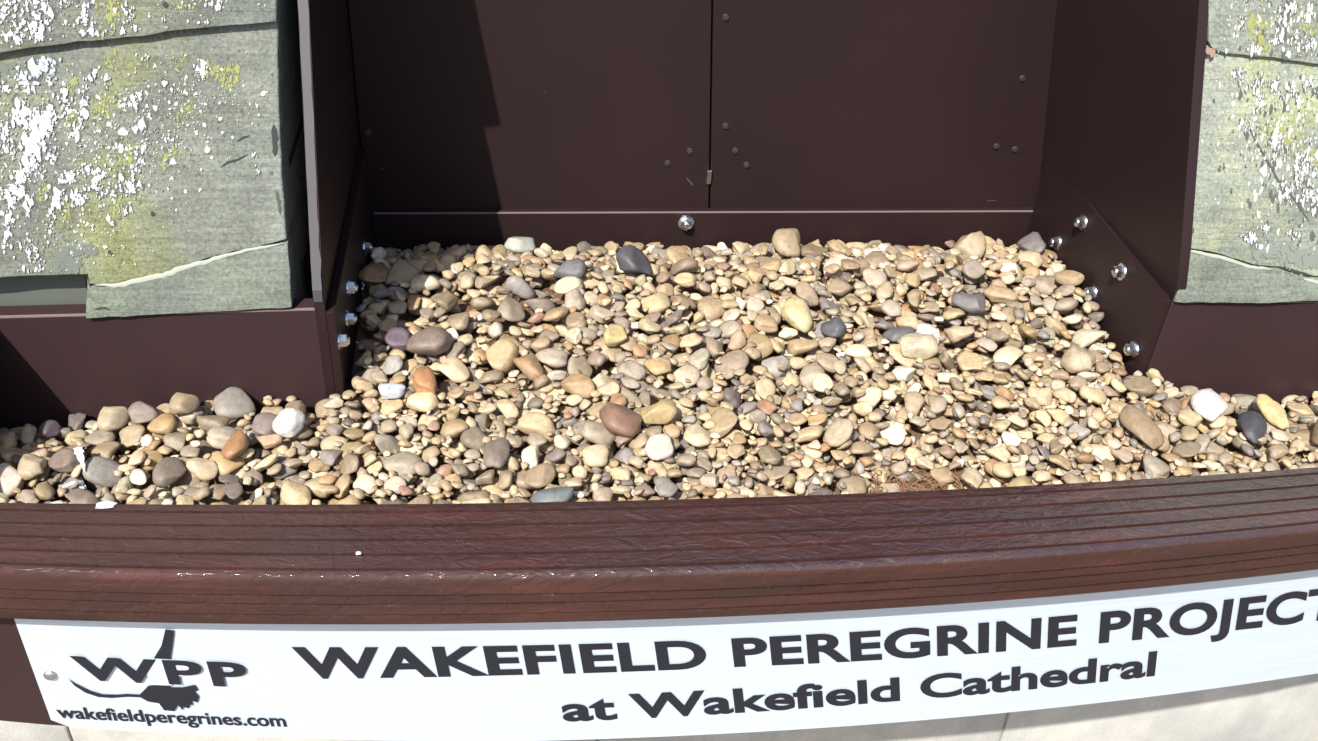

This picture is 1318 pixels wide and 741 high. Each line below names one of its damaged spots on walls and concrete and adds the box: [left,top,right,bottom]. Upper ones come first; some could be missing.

water stain [0,58,31,93]
water stain [0,238,98,306]